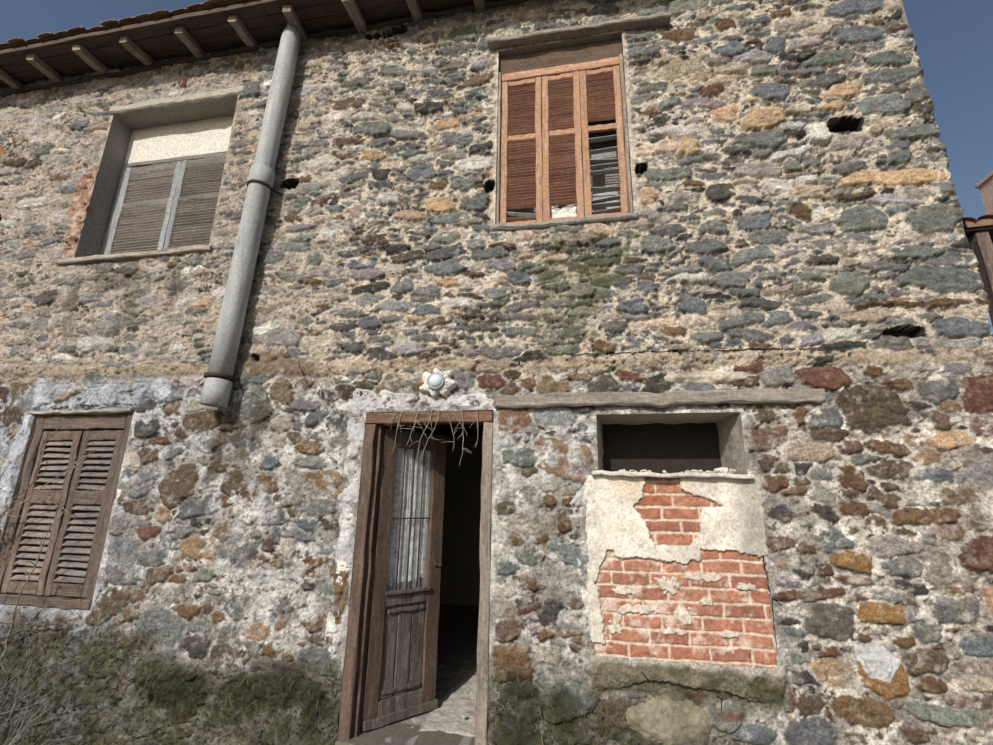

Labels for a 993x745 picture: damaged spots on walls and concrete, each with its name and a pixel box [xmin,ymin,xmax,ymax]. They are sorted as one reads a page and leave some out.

peeling [502,463,521,490]
flaking render [534,434,769,644]
damp [234,675,326,734]
crack [617,670,764,714]